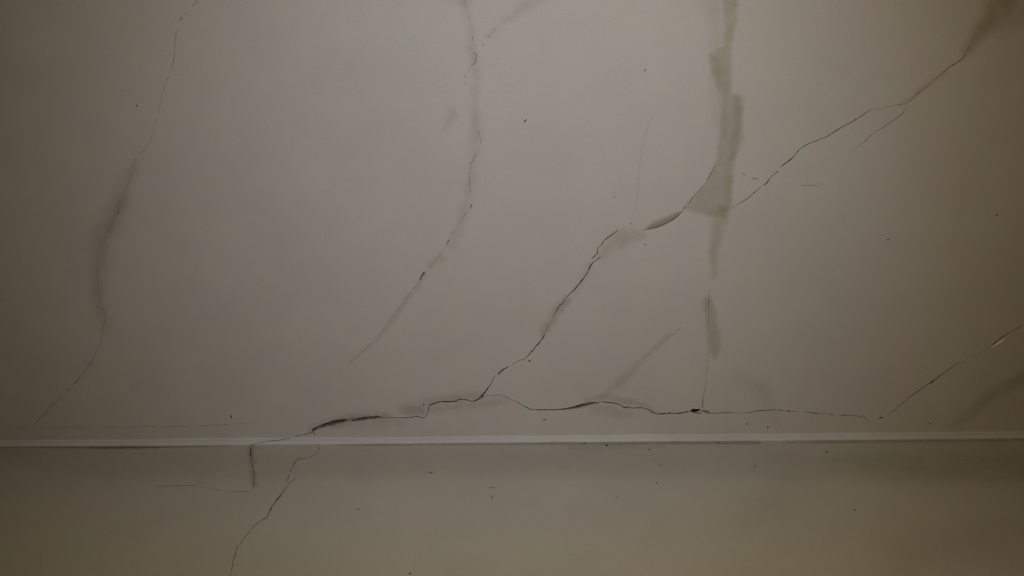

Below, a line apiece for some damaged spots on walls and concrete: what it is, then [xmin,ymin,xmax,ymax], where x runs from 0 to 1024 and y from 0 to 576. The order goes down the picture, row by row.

crack [187,122,1022,576]
crack [731,46,970,209]